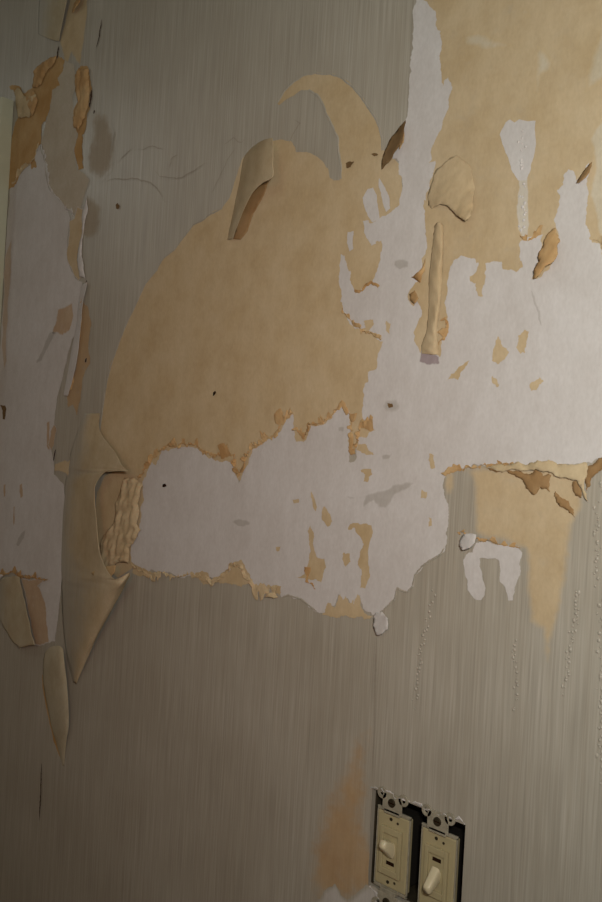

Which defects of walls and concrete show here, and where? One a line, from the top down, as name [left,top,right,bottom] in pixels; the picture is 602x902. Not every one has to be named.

flaking render [0,0,602,684]
damp [419,351,440,365]
peeling [42,646,69,766]
flaking render [315,884,378,902]